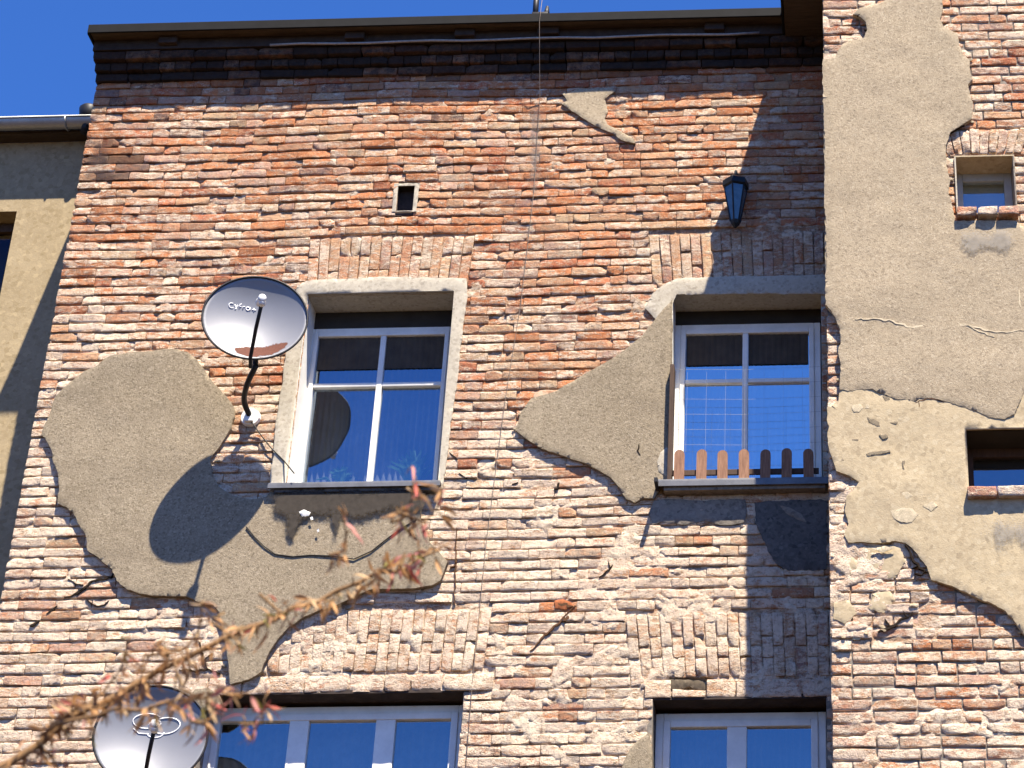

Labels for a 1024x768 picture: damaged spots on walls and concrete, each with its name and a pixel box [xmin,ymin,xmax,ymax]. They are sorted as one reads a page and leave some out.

spalling [941,0,1024,227]
crack [855,318,923,328]
crack [959,289,1024,337]
peeling [513,300,673,504]
spalling [852,404,888,439]
peeling [41,349,448,686]
crack [530,603,576,651]
spalling [554,599,572,610]
spalling [828,447,1024,768]
peeling [193,688,221,712]